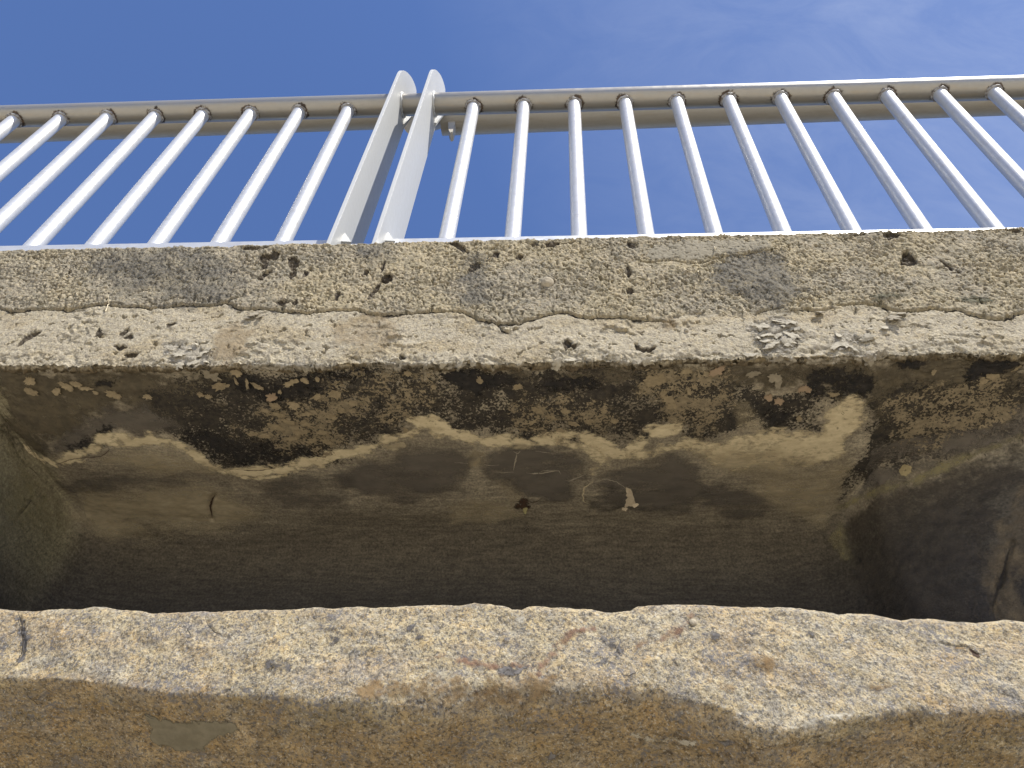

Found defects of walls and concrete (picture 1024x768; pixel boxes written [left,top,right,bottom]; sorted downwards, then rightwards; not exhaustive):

crack [7,298,661,334]
crack [844,304,1020,322]
spalling [551,340,577,371]
peeling [596,312,908,437]
damp [23,359,1024,622]